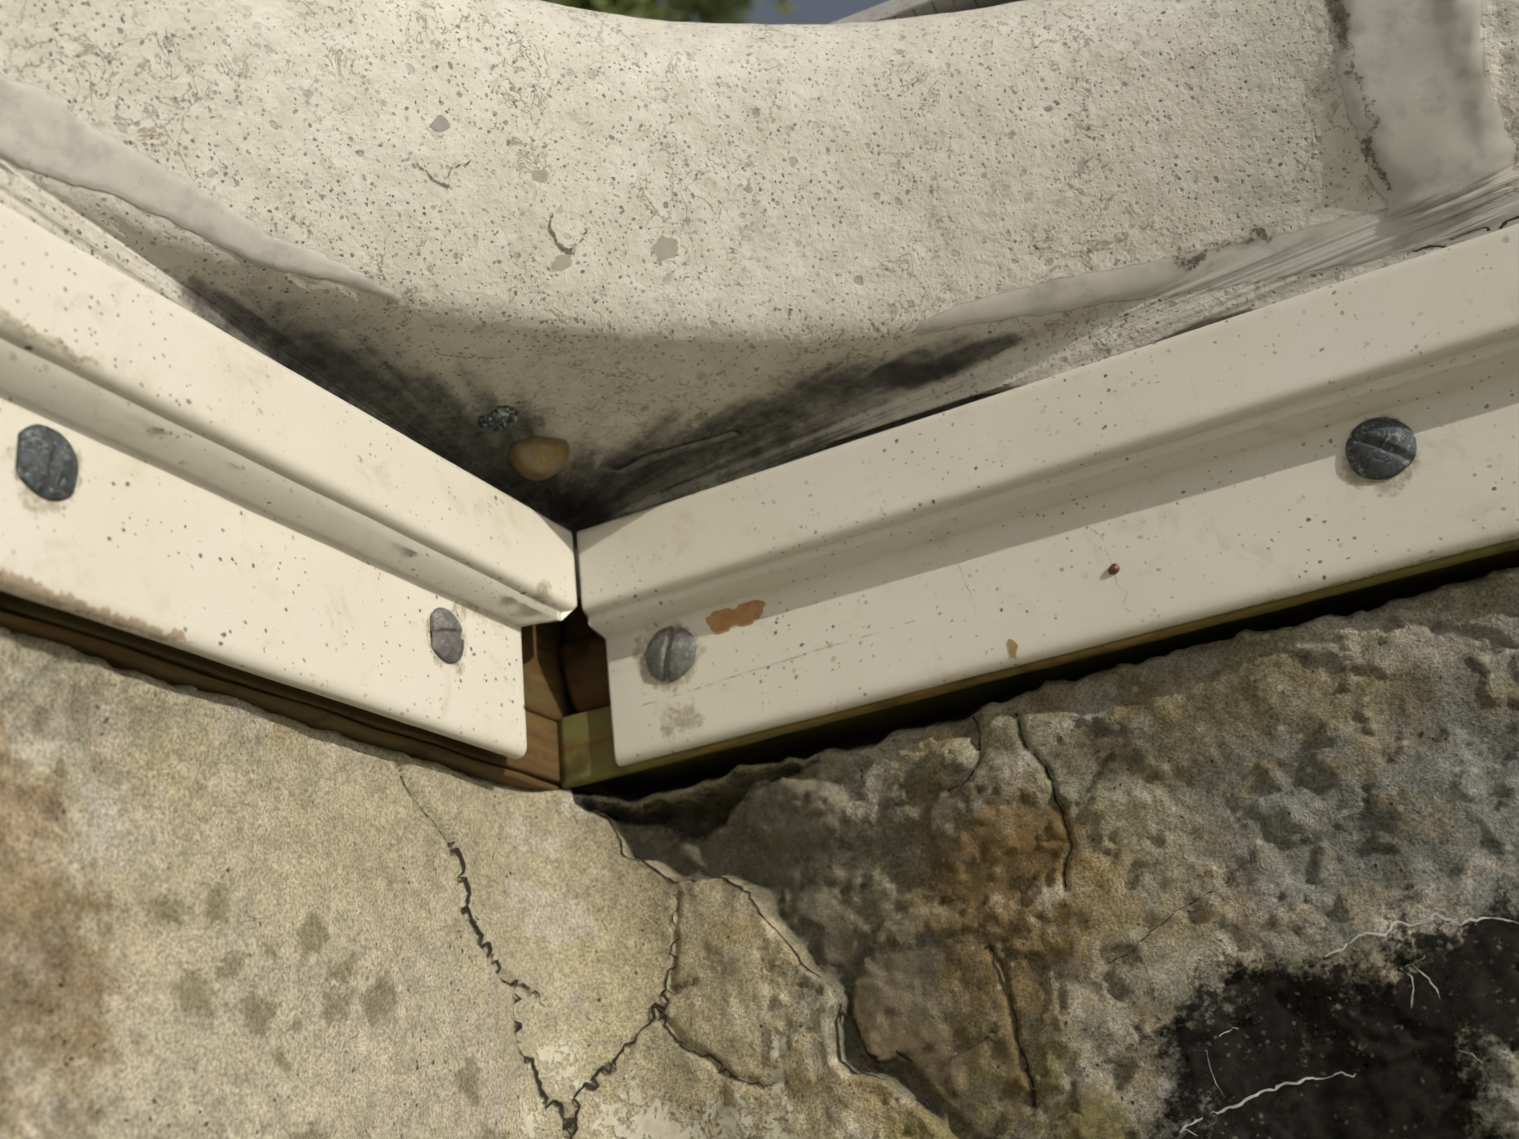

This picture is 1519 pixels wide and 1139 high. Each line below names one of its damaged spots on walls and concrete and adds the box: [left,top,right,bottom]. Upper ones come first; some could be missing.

damp [182,281,1019,545]
crack [948,716,981,792]
crack [1014,713,1073,888]
crack [400,776,787,1139]
spalling [577,763,992,1135]
crack [940,944,1036,1108]
damp [1138,872,1519,1139]